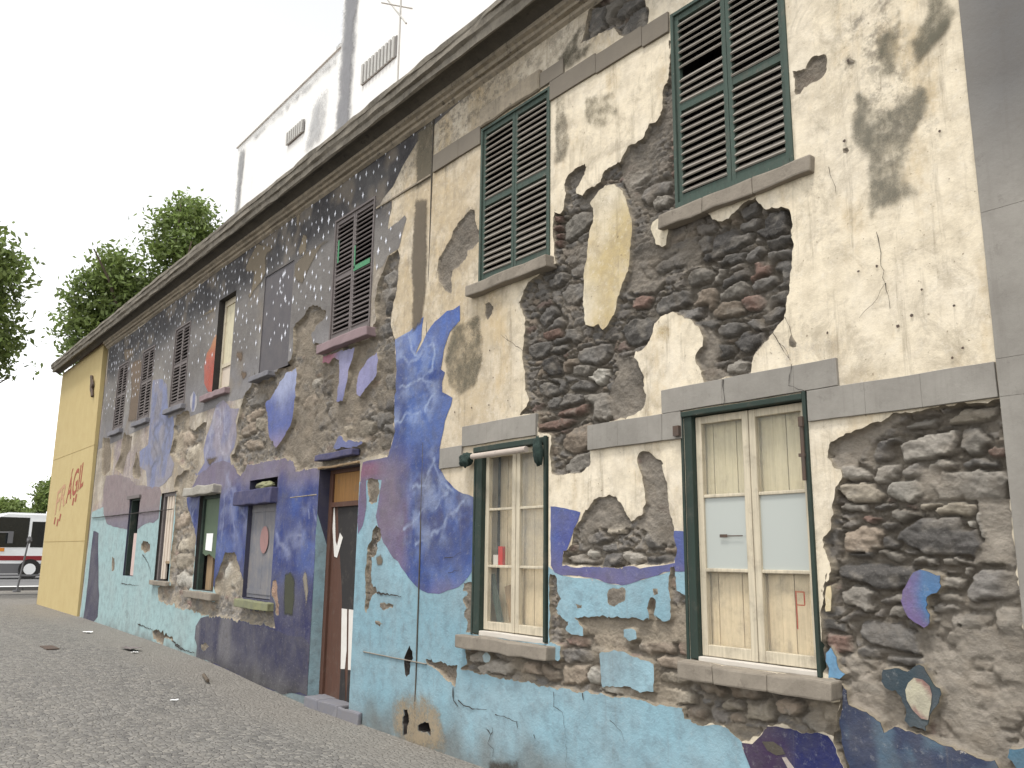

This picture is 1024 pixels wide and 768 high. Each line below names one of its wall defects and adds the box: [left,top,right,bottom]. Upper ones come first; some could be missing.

spalling [793,54,827,95]
damp [912,0,954,59]
damp [854,87,926,208]
spalling [437,209,479,294]
spalling [519,40,794,475]
crack [859,232,890,318]
spalling [158,410,308,628]
spalling [365,525,393,626]
spalling [426,399,1024,768]